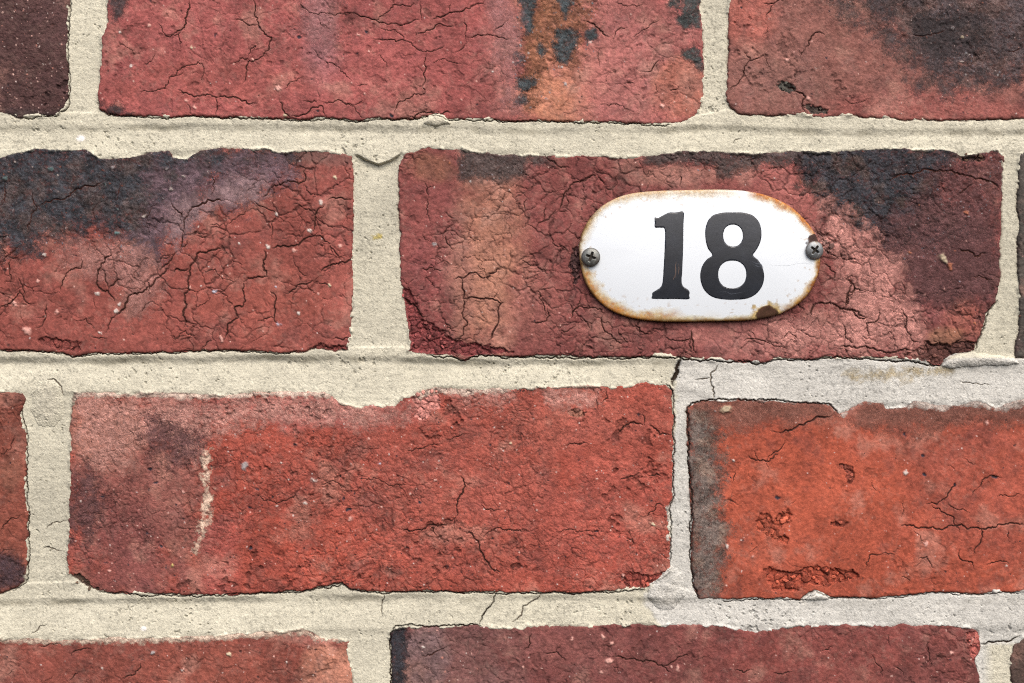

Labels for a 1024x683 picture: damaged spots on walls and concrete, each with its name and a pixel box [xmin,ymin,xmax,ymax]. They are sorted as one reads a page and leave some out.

crack [109,2,676,127]
crack [890,165,998,193]
crack [1,171,353,358]
crack [959,249,997,348]
crack [407,155,938,594]
crack [111,477,638,683]
spalling [756,509,791,544]
spalling [763,566,859,591]
crack [831,460,1021,599]
crack [33,625,93,681]